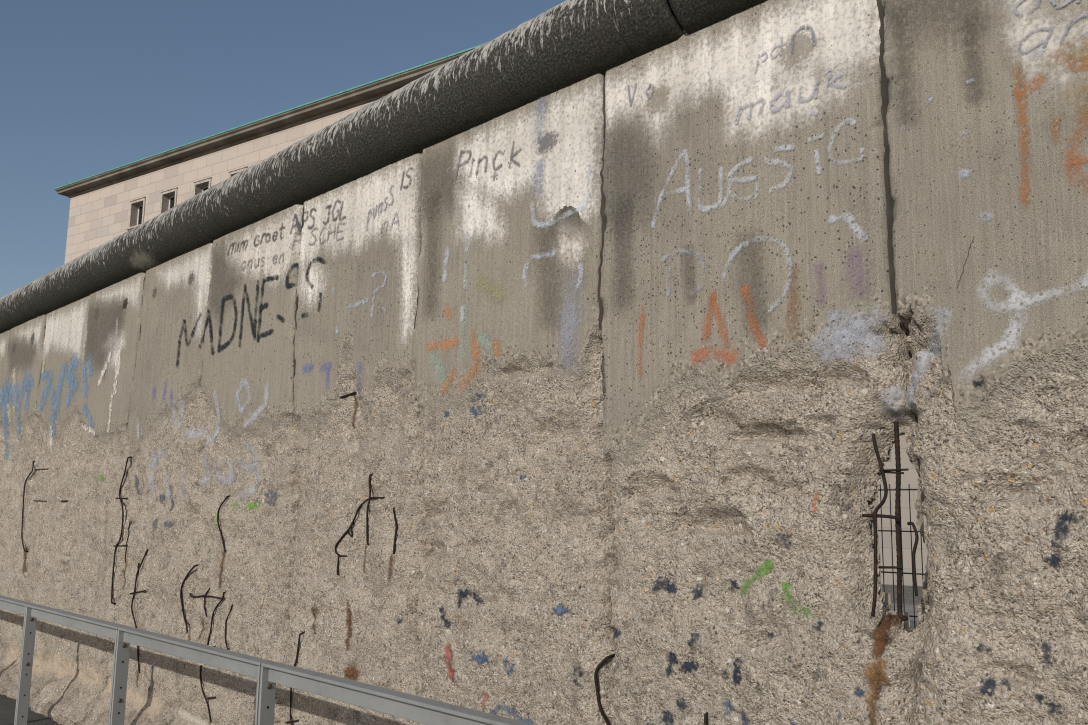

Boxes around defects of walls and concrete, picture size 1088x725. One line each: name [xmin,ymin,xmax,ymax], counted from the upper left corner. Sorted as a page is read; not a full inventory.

peeling [559,234,582,260]
spalling [0,303,1088,725]
corrosion [866,613,899,724]